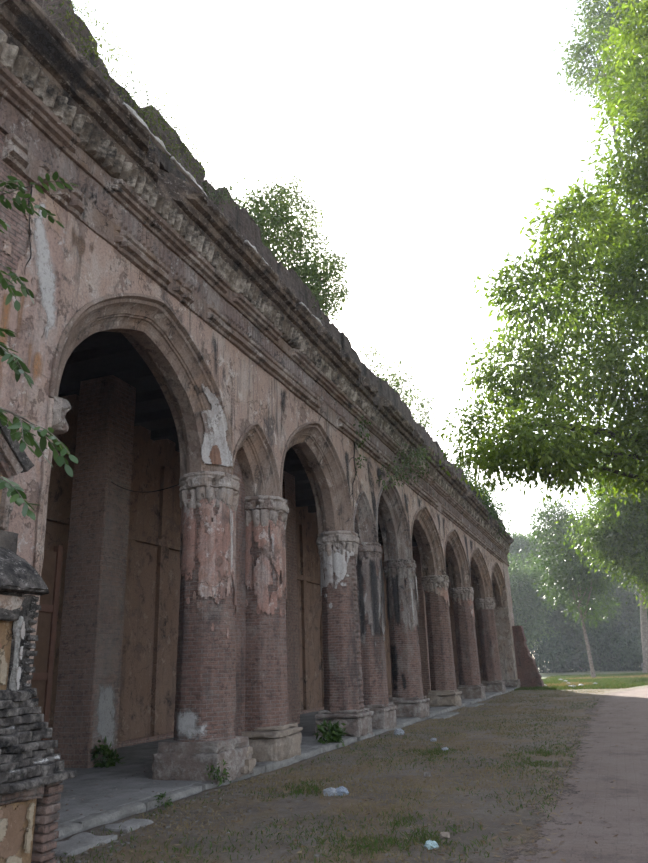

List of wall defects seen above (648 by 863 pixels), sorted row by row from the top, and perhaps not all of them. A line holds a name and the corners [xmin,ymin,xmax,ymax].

peeling [179,499,287,617]
peeling [320,549,475,647]
flaking render [0,621,25,691]
water stain [176,712,205,738]
flaking render [0,803,36,863]